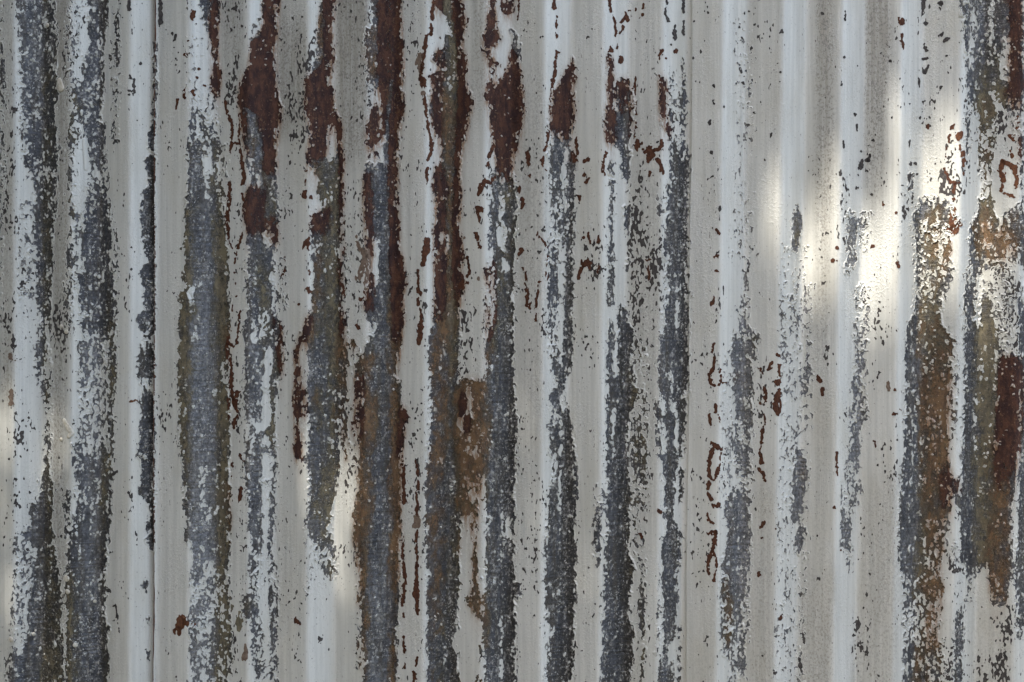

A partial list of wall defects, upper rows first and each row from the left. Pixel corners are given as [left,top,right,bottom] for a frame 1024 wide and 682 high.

corrosion [415,52,427,95]
corrosion [549,50,560,115]
corrosion [946,207,963,235]
corrosion [416,237,431,346]
peeling [0,0,719,682]
peeling [710,8,826,682]
corrosion [758,353,782,416]